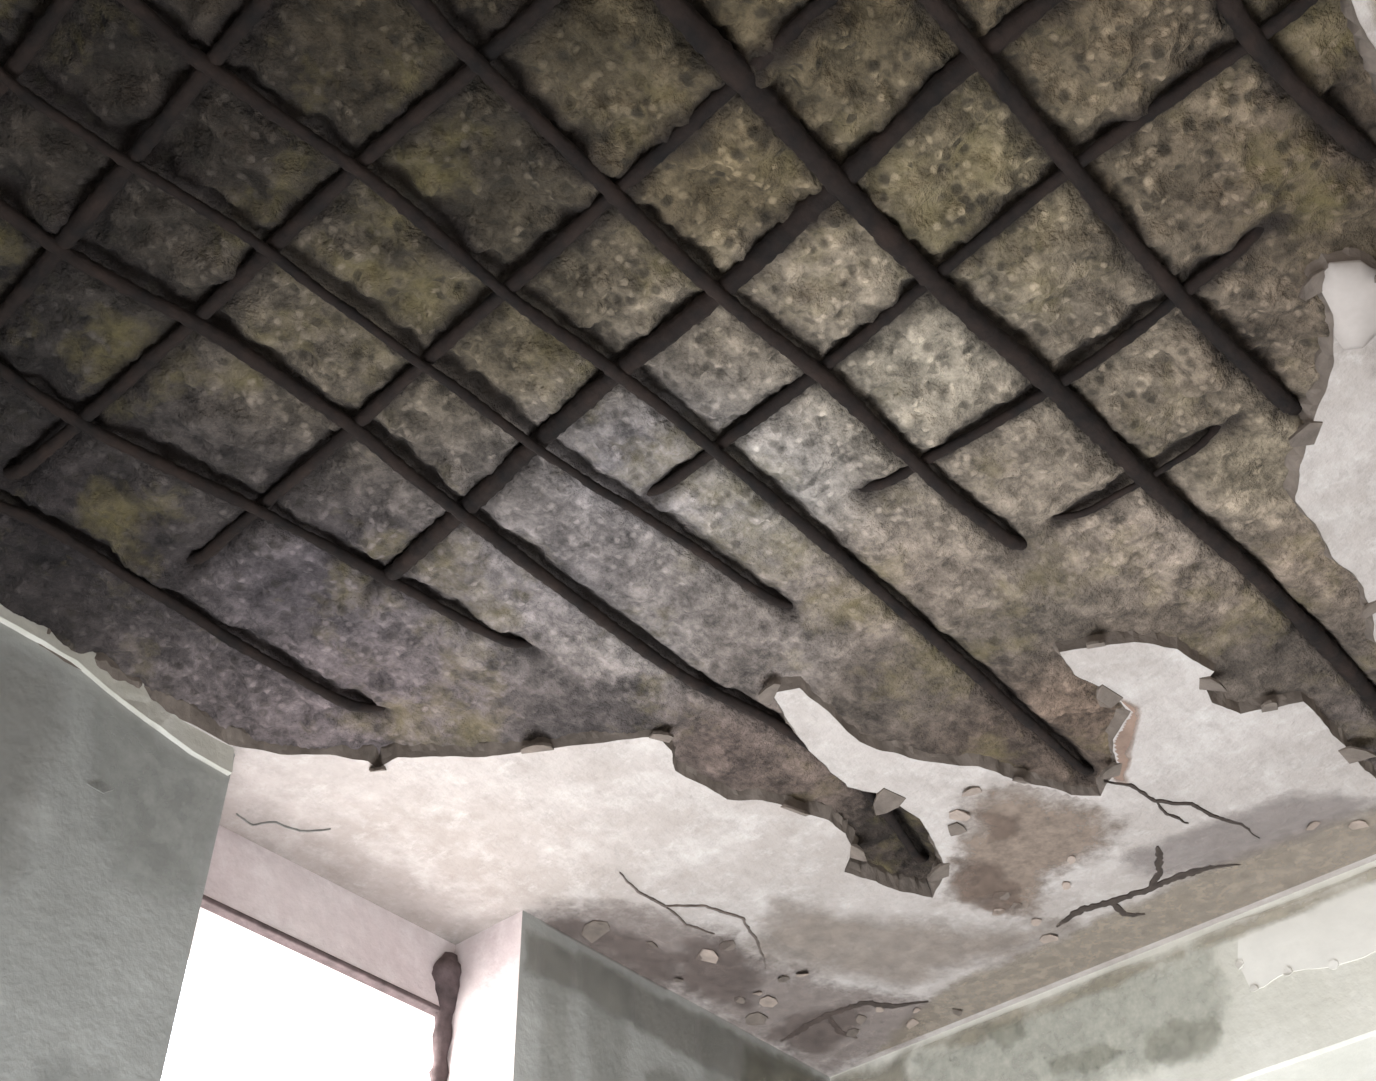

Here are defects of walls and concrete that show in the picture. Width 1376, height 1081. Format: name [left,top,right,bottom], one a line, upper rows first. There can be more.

spalling [0,0,1094,898]
spalling [367,0,1376,796]
crack [619,872,766,969]
damp [546,810,1376,1081]
peeling [948,785,1106,916]
crack [1056,779,1260,927]